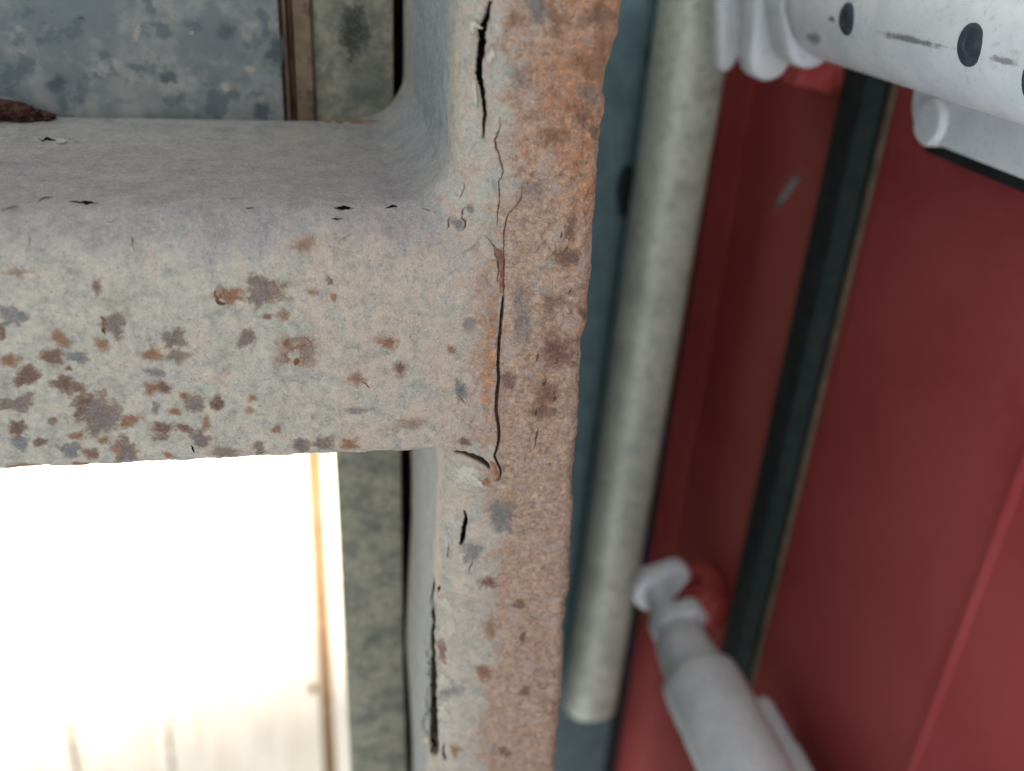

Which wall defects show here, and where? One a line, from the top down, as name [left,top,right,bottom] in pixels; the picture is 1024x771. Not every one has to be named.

crack [425,3,524,482]
corrosion [554,250,580,266]
corrosion [213,273,286,320]
corrosion [143,349,162,359]
corrosion [281,337,313,366]
corrosion [1,331,92,417]
corrosion [10,421,27,437]
corrosion [121,415,139,427]
corrosion [146,382,191,434]
corrosion [203,394,224,429]
corrosion [73,438,122,465]
crack [422,511,474,761]